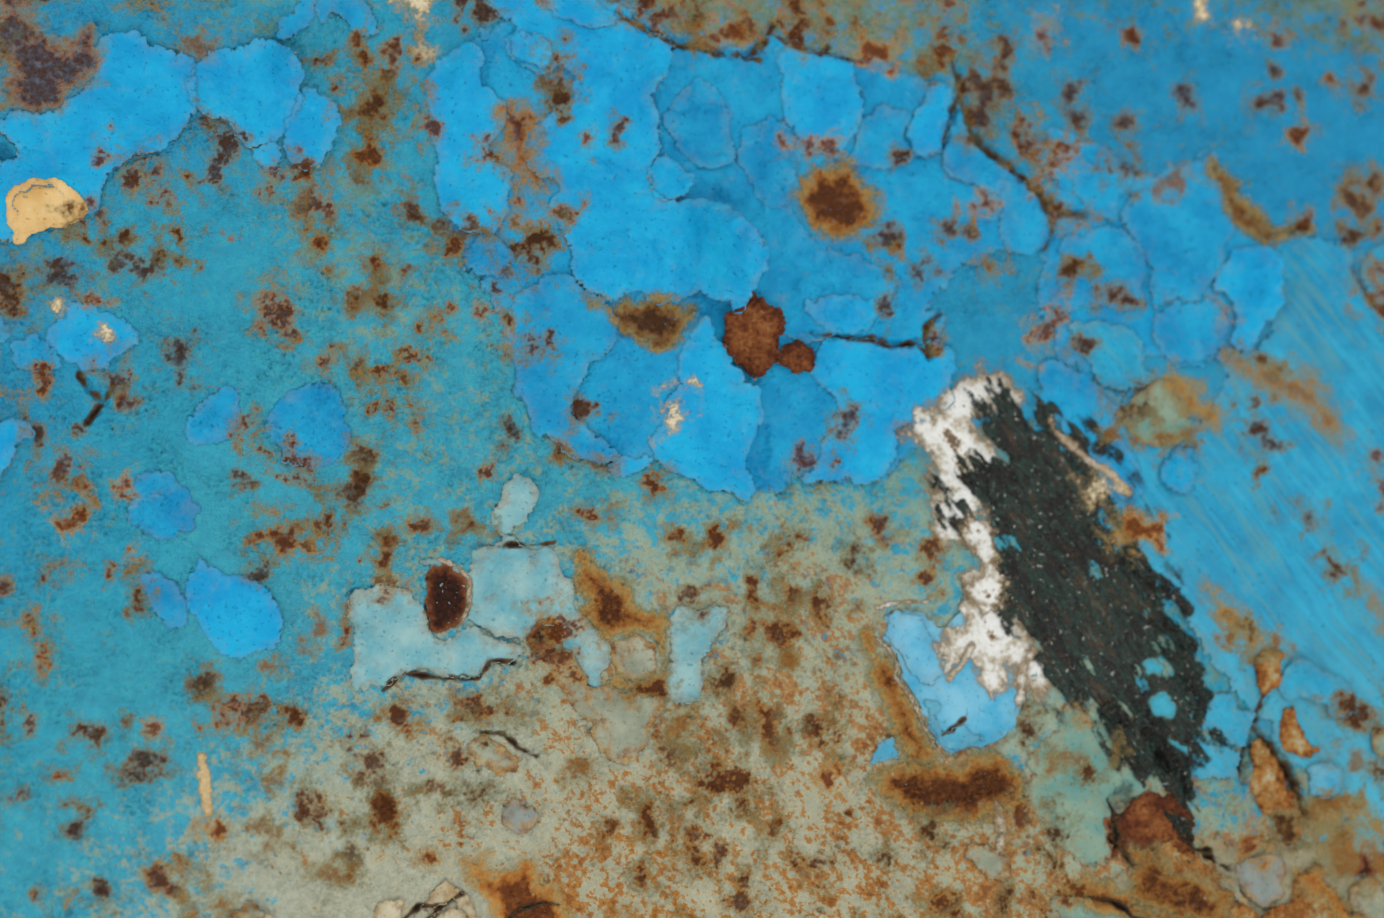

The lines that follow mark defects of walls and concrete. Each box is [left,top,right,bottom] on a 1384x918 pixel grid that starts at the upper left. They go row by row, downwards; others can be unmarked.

corrosion [0,113,253,342]
peeling [0,0,379,245]
corrosion [777,131,942,318]
corrosion [609,0,1185,233]
crack [1352,270,1377,310]
peeling [423,0,1384,918]
leakage [1048,418,1132,496]
peeling [344,473,729,767]
corrosion [413,520,851,918]
leakage [1100,695,1200,844]
leakage [1123,554,1214,727]
crack [404,891,465,918]